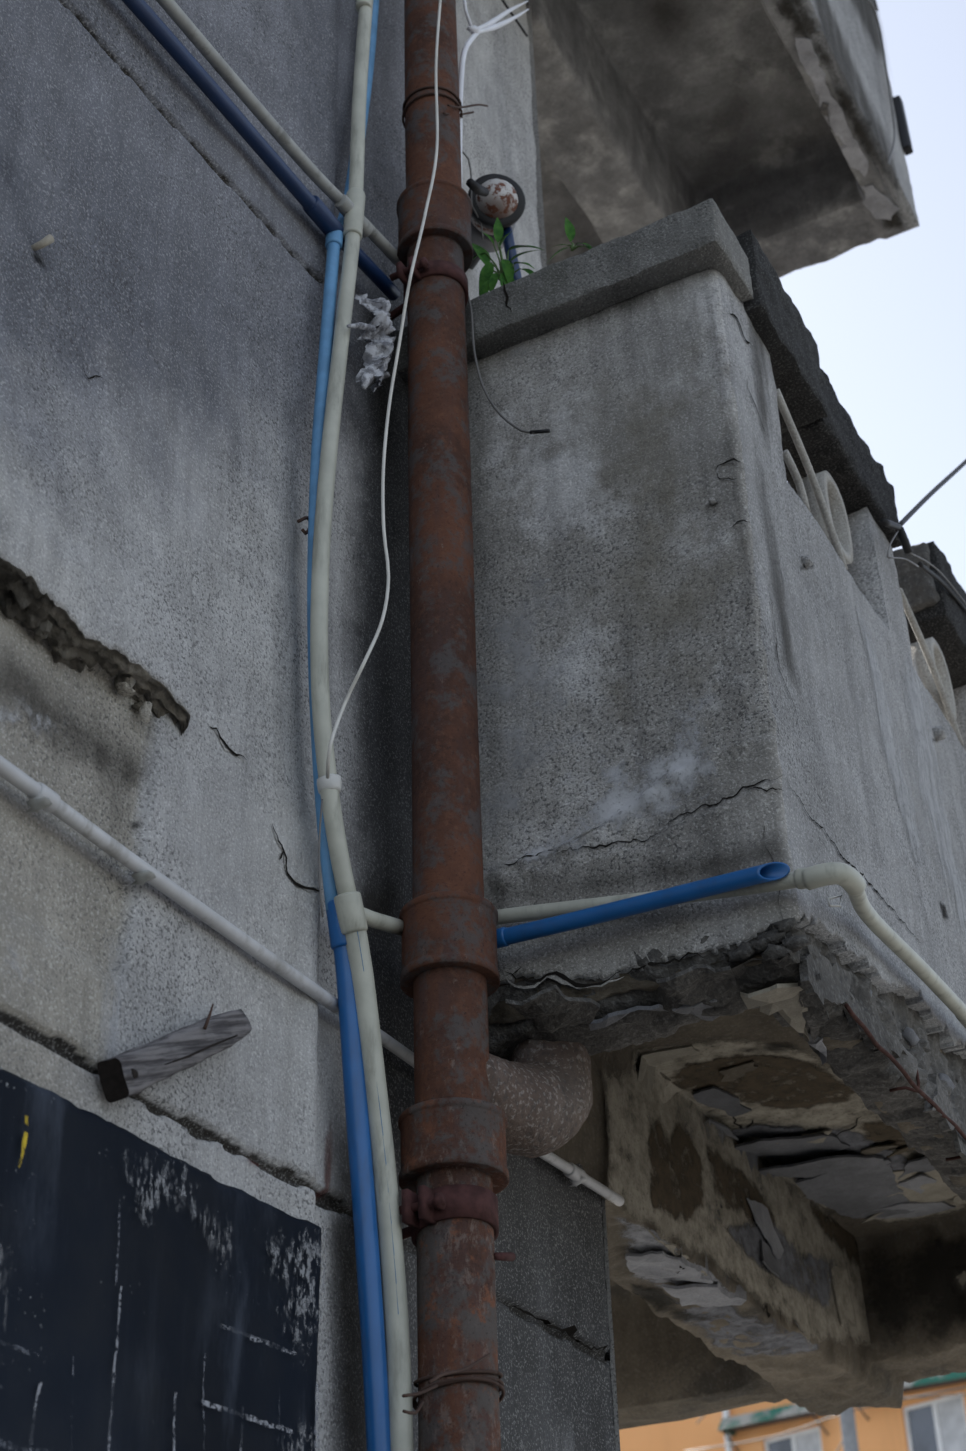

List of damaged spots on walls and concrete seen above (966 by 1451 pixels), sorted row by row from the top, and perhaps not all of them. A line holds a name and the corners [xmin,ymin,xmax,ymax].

leakage [777,0,903,228]
spalling [114,673,152,724]
crack [272,824,322,892]
crack [492,593,921,943]
peeling [487,891,966,1356]
crack [512,1305,608,1353]